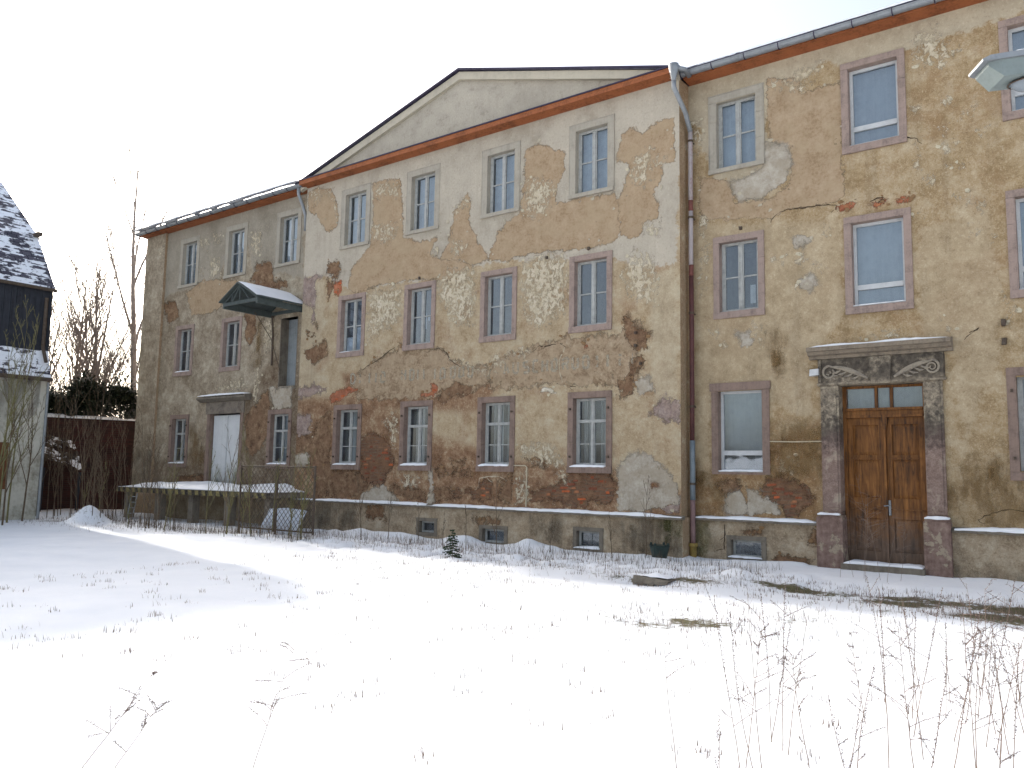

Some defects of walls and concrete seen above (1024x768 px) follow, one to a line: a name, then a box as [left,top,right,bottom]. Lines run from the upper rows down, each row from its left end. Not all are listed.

crack [771,204,837,221]
flaking render [835,199,856,212]
flaking render [871,191,919,217]
flaking render [296,118,676,510]
crack [532,342,576,389]
peeling [648,398,681,424]
flaking render [717,453,815,519]